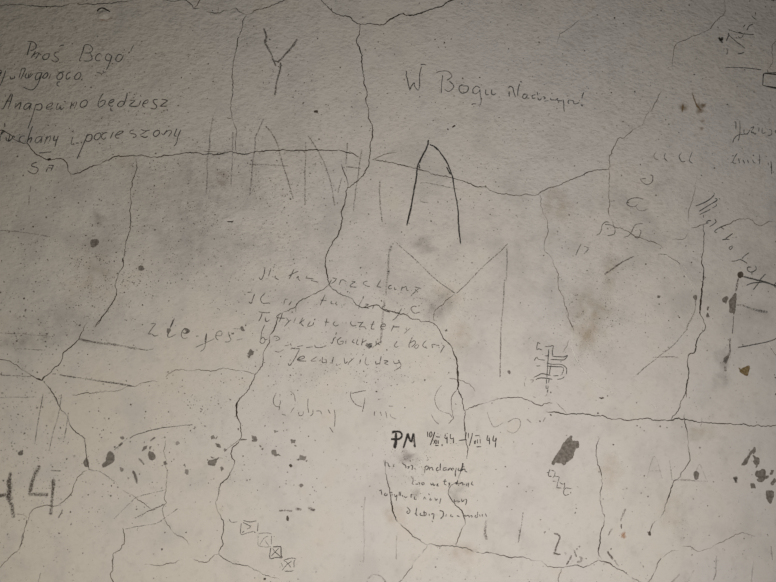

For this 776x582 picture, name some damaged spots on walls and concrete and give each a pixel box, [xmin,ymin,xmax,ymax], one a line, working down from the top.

crack [0,0,632,565]
crack [500,200,775,433]
flaking render [552,435,579,465]
flaking render [733,440,776,504]
crack [198,518,267,576]
crack [546,515,623,582]